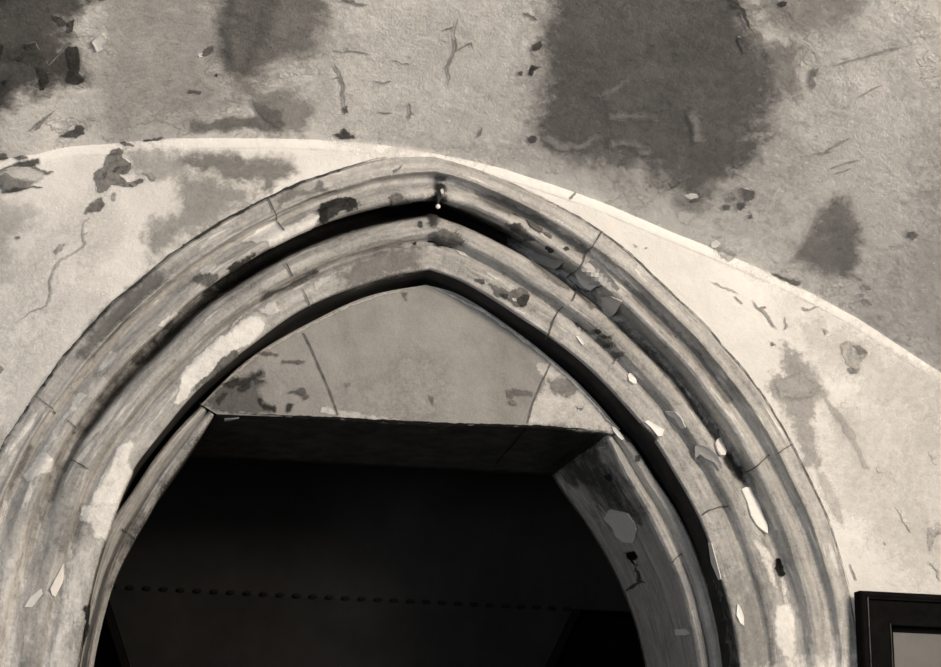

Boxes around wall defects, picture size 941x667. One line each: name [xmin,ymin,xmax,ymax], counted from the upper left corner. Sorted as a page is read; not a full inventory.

spalling [37,15,85,90]
peeling [92,33,107,52]
water stain [190,0,333,133]
crack [444,16,473,89]
water stain [527,0,802,198]
peeling [85,137,163,215]
peeling [318,197,366,224]
water stain [797,199,859,276]
crack [0,157,402,452]
peeling [840,341,870,374]
water stain [770,342,867,523]
peeling [741,487,768,534]